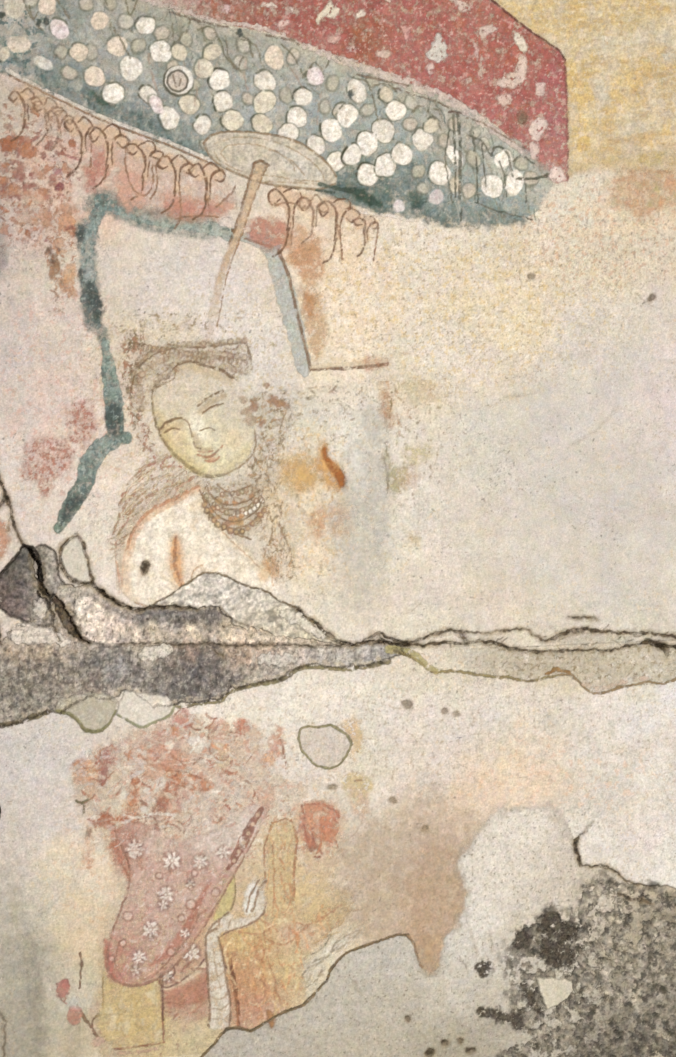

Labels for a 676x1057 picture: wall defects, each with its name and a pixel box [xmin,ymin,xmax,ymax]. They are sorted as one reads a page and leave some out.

crack [0,480,197,644]
spalling [0,537,408,733]
peeling [489,628,676,691]
spalling [201,805,676,1057]